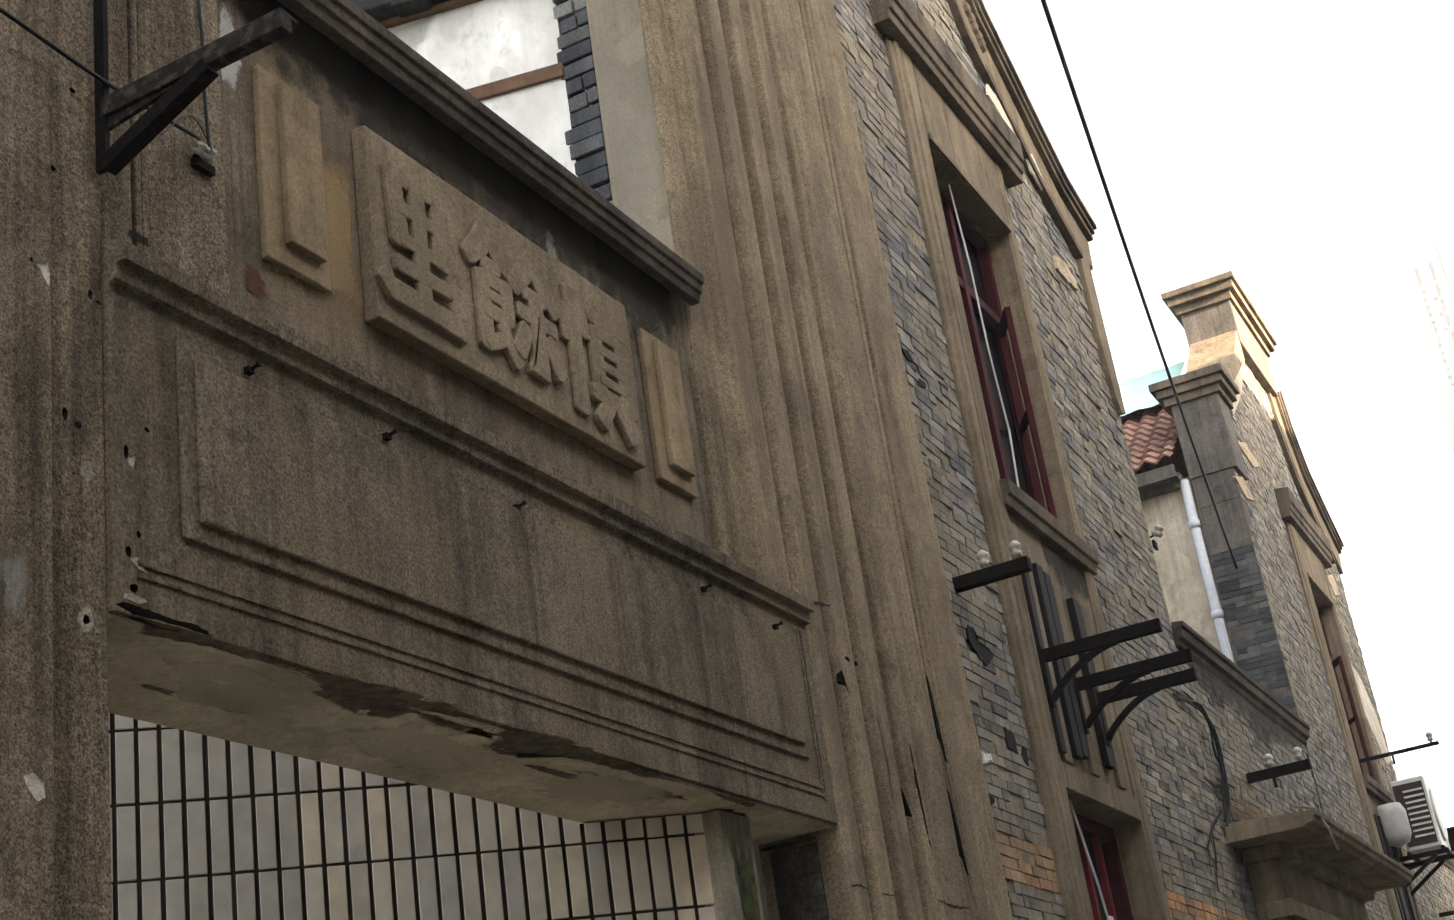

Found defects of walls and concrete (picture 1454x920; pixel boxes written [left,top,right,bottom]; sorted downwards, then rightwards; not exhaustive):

peeling [124,592,687,800]